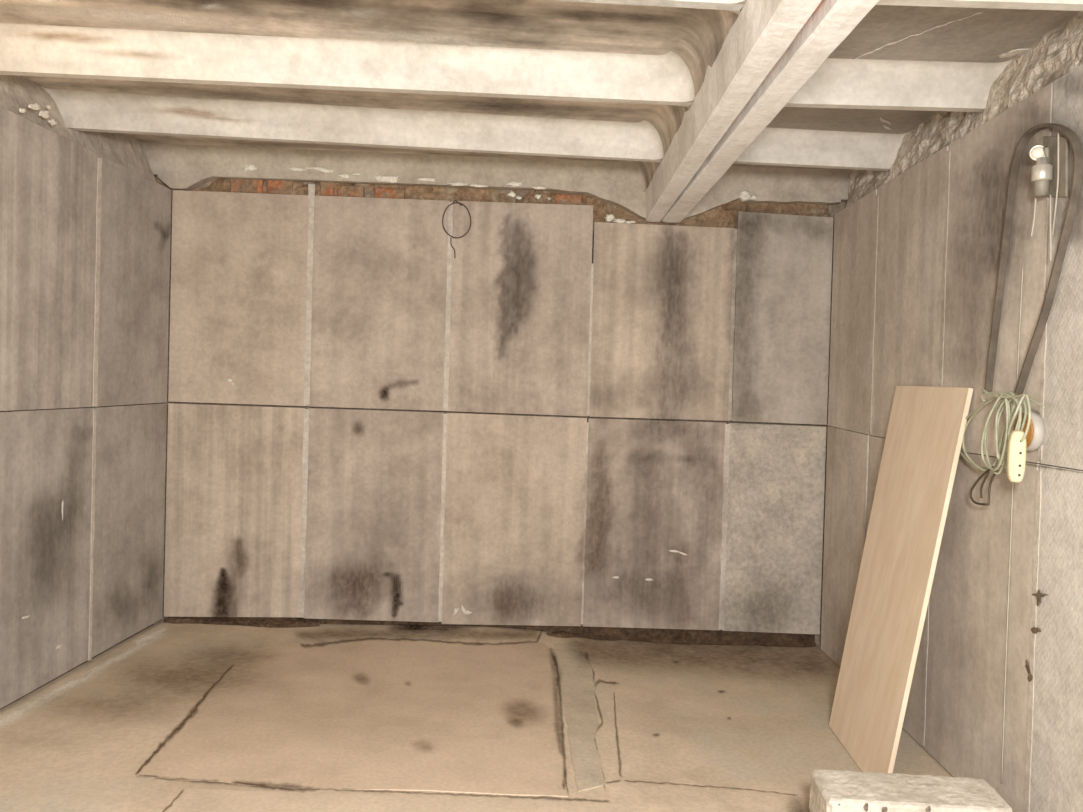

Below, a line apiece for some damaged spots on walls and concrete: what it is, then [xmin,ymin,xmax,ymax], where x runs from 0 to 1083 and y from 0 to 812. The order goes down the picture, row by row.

crack [854,12,982,60]
spalling [845,11,1083,208]
spalling [288,167,361,179]
spalling [375,175,400,183]
spalling [417,178,488,188]
water stain [214,569,235,621]
water stain [342,572,457,636]